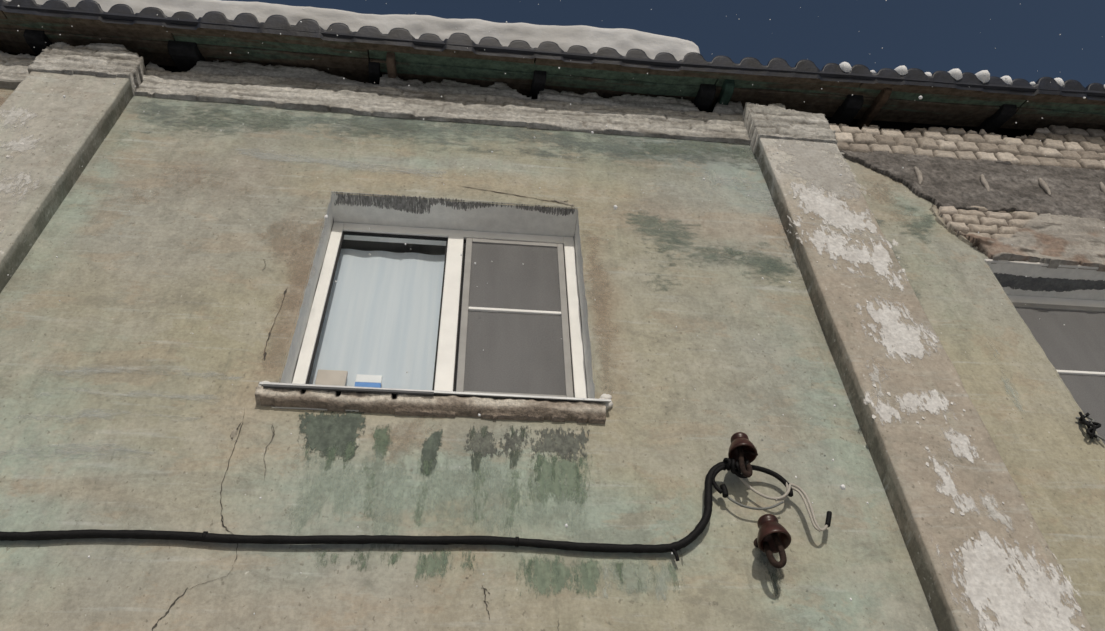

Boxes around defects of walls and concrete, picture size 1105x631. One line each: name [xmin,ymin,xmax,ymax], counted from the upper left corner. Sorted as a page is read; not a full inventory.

crack [262,289,287,360]
flaking render [766,123,1105,631]
crack [152,408,245,631]
water stain [299,411,390,469]
water stain [420,430,443,476]
water stain [465,425,590,523]